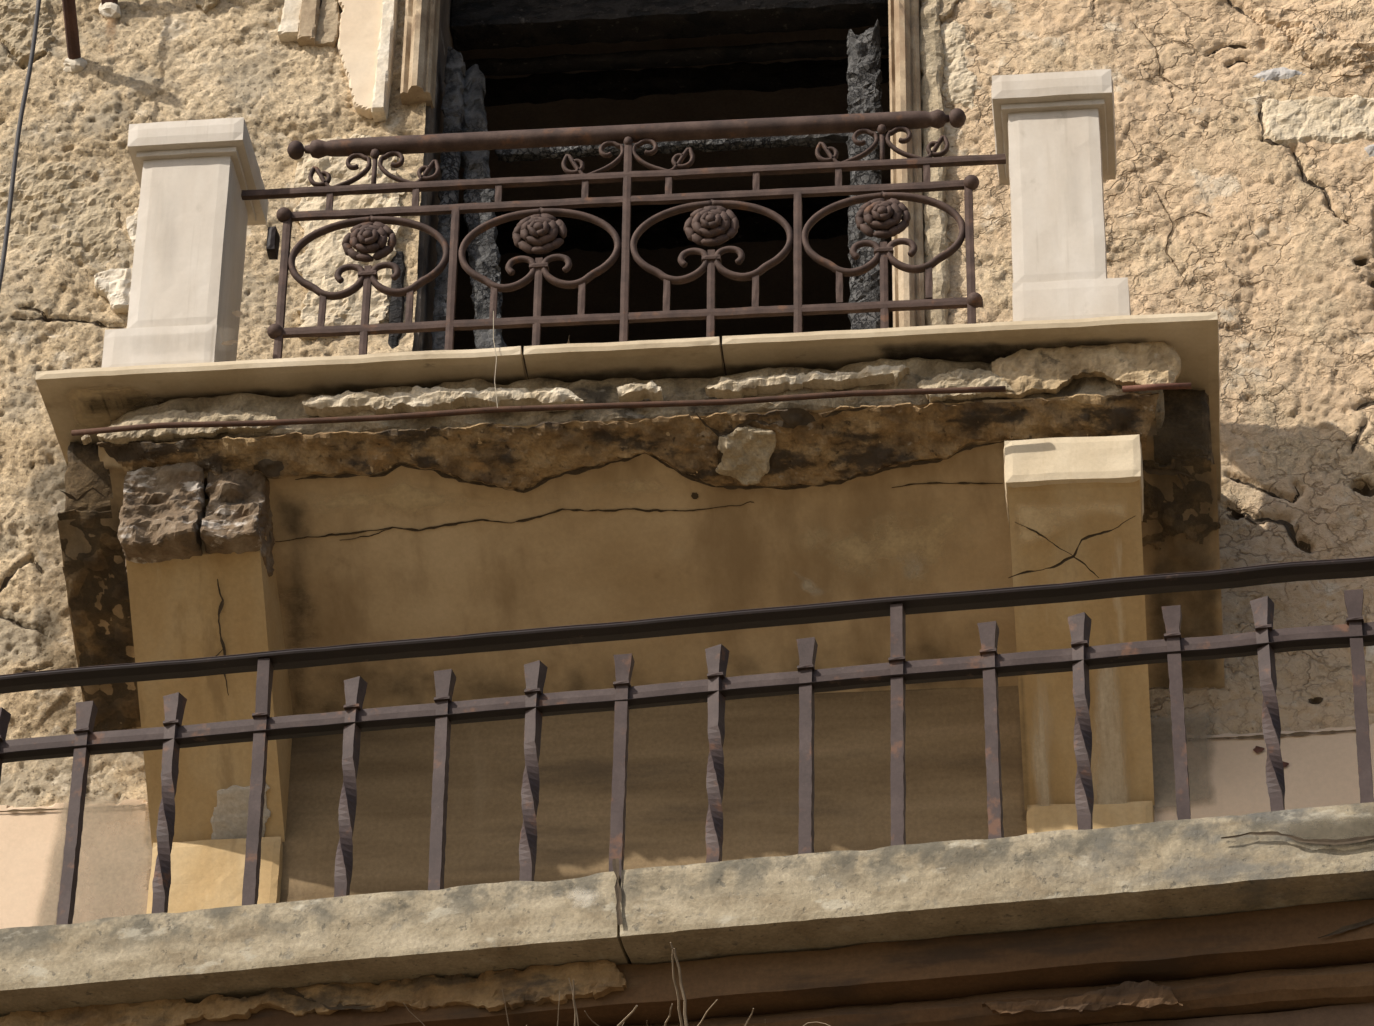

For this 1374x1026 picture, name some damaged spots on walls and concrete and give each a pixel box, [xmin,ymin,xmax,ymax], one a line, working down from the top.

crack [1133,0,1251,89]
crack [1258,106,1348,224]
crack [1154,189,1212,281]
spalling [81,410,279,445]
spalling [302,386,584,417]
spalling [617,380,663,402]
spalling [705,341,1181,403]
crack [1351,401,1374,453]
crack [275,407,1007,542]
crack [1227,477,1300,547]
water stain [1156,590,1215,639]
spalling [0,960,627,1026]